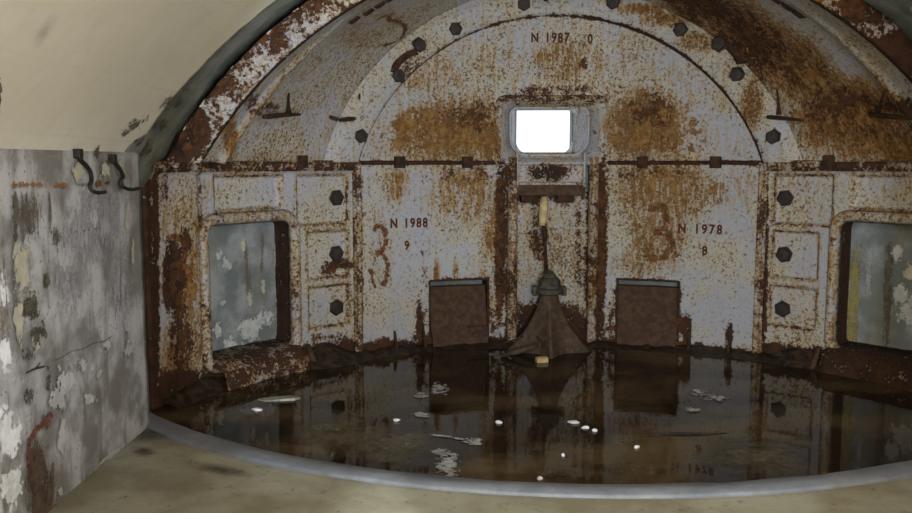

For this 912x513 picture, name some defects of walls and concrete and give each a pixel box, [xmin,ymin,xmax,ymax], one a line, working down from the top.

corrosion [294,0,333,16]
corrosion [607,88,713,154]
peeling [0,239,51,380]
leakage [10,186,134,323]
corrosion [167,233,198,371]
corrosion [380,101,505,338]
corrosion [596,169,615,341]
corrosion [627,165,725,279]
peeling [0,357,102,513]